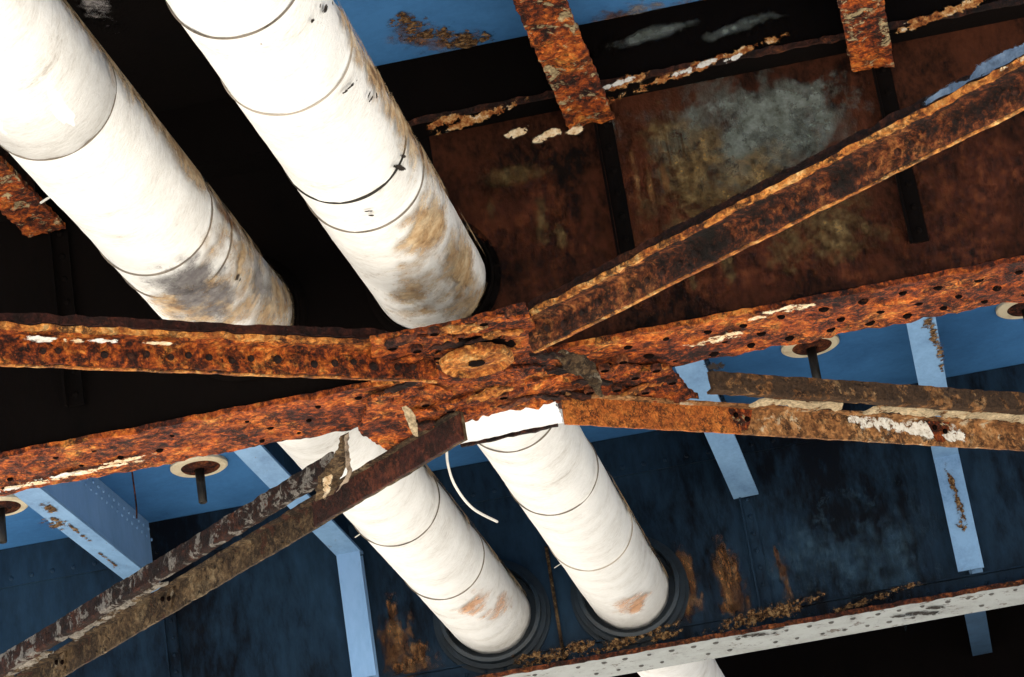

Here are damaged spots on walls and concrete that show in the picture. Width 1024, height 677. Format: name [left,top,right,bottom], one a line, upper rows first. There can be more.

corrosion [603,34,788,102]
corrosion [427,98,527,135]
corrosion [504,126,583,143]
corrosion [691,200,887,293]
corrosion [1007,302,1024,317]
corrosion [792,339,832,355]
peeling [0,455,146,491]
corrosion [181,461,220,475]
peeling [322,475,333,498]
corrosion [0,501,21,514]
peeling [40,502,91,541]
corrosion [381,600,426,677]